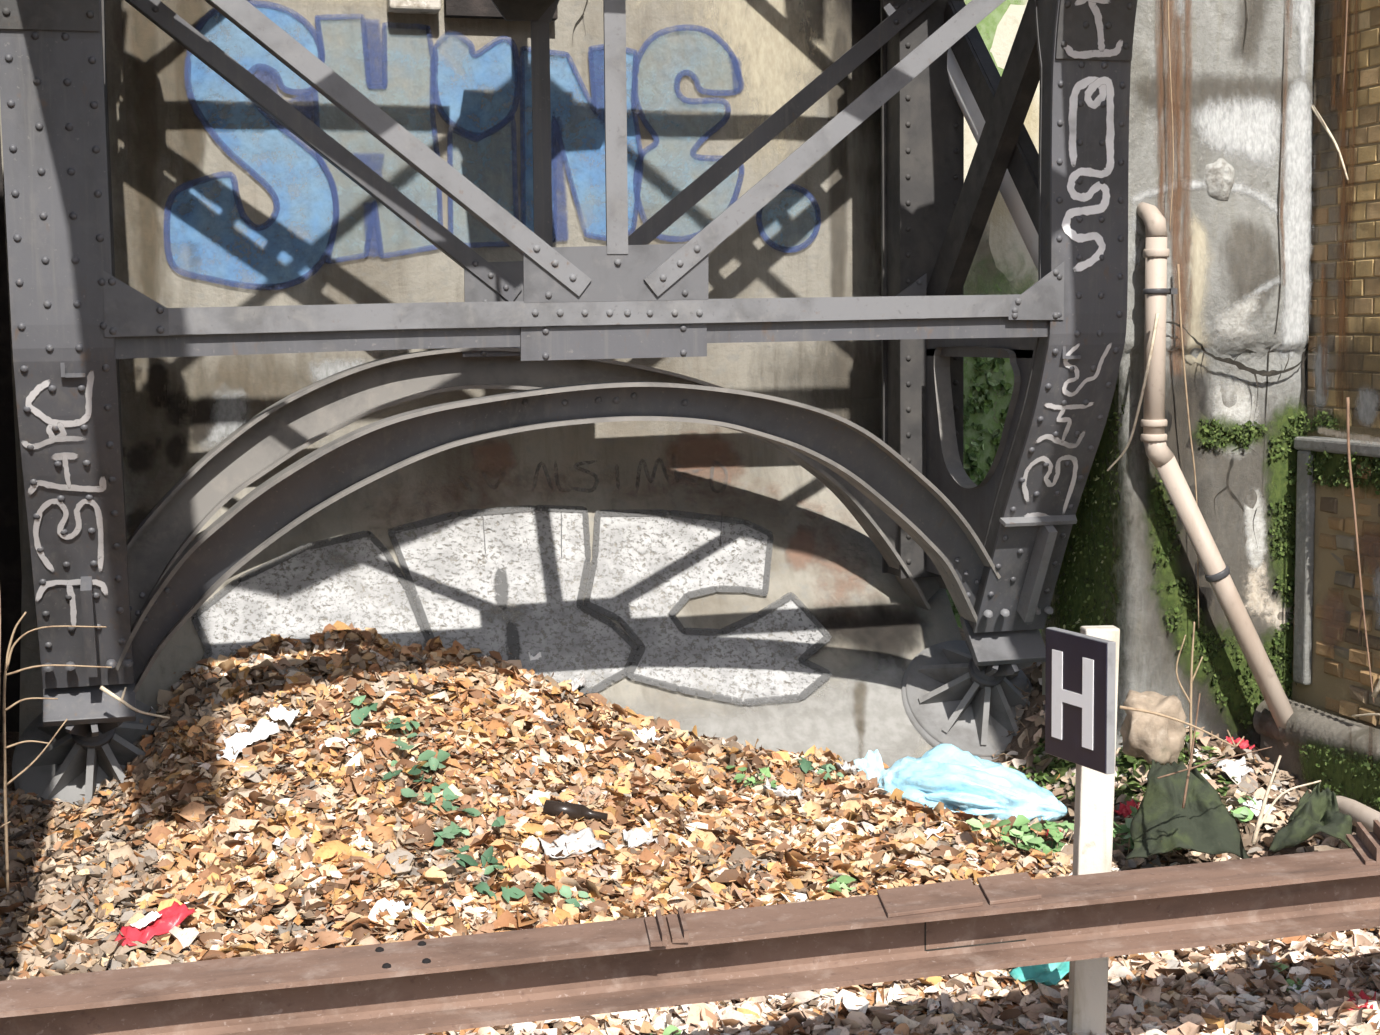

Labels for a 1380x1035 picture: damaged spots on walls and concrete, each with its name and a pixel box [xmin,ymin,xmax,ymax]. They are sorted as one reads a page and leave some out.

corrosion [1157,0,1191,373]
damp [1133,0,1336,356]
damp [127,367,296,518]
damp [1152,463,1183,533]
damp [1165,221,1205,448]
damp [1180,561,1213,613]
crack [1166,17,1316,548]
damp [1318,342,1380,444]
spalling [1359,534,1380,566]
damp [1174,632,1254,745]